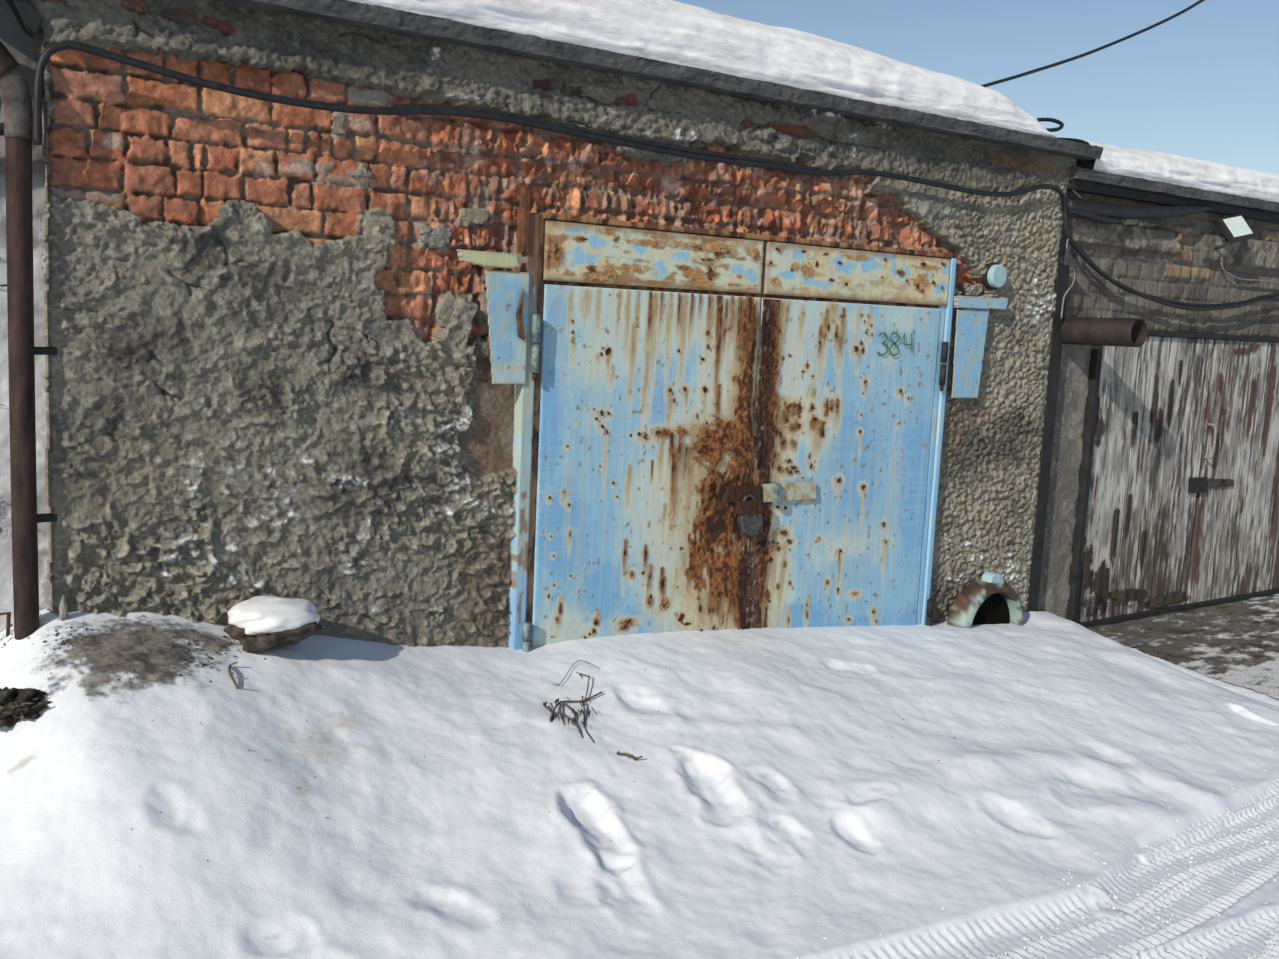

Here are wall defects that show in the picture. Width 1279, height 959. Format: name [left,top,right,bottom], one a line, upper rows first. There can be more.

flaking render [42,46,983,478]
corrosion [548,238,563,272]
corrosion [881,258,946,294]
corrosion [586,234,873,631]
peeling [1131,360,1183,449]
peeling [1219,344,1279,526]
peeling [1079,493,1191,618]